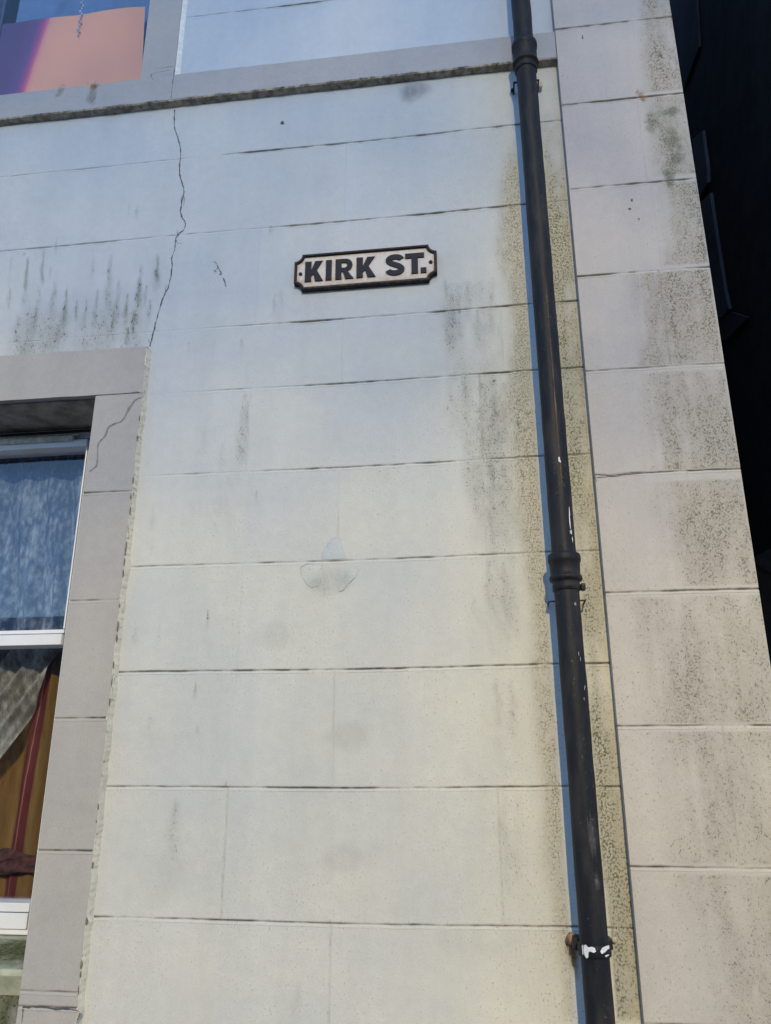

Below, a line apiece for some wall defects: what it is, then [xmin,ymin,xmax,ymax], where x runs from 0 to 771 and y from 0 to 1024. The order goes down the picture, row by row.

crack [148,66,186,346]
crack [89,391,141,472]
damp [633,0,771,865]